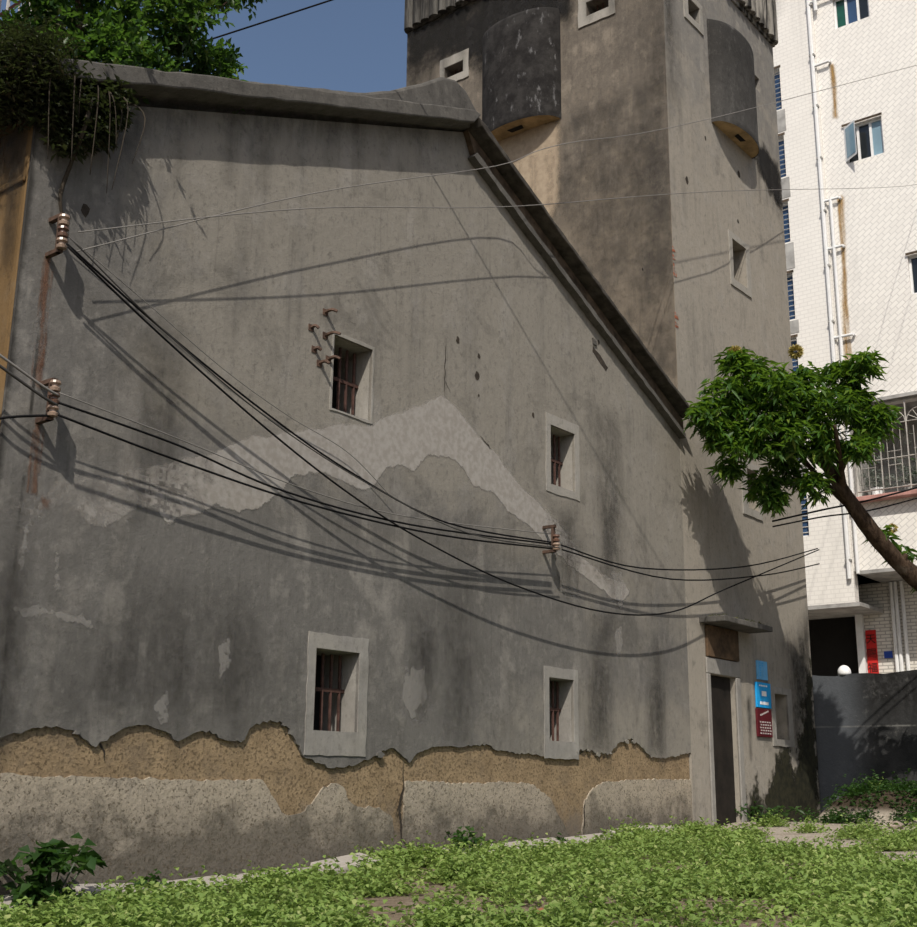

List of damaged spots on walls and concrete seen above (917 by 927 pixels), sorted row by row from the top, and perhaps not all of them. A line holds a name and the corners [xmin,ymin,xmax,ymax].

flaking render [0,721,690,851]
leakage [746,633,820,822]